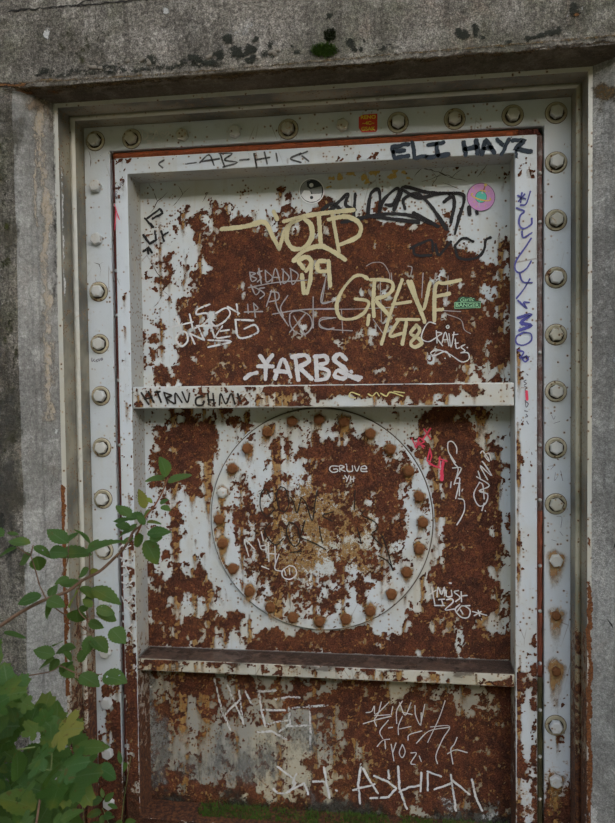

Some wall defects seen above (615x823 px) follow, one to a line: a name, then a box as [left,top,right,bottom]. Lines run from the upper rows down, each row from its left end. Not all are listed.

crack [8,0,148,12]
rust [98,186,570,823]
rust [585,581,593,823]